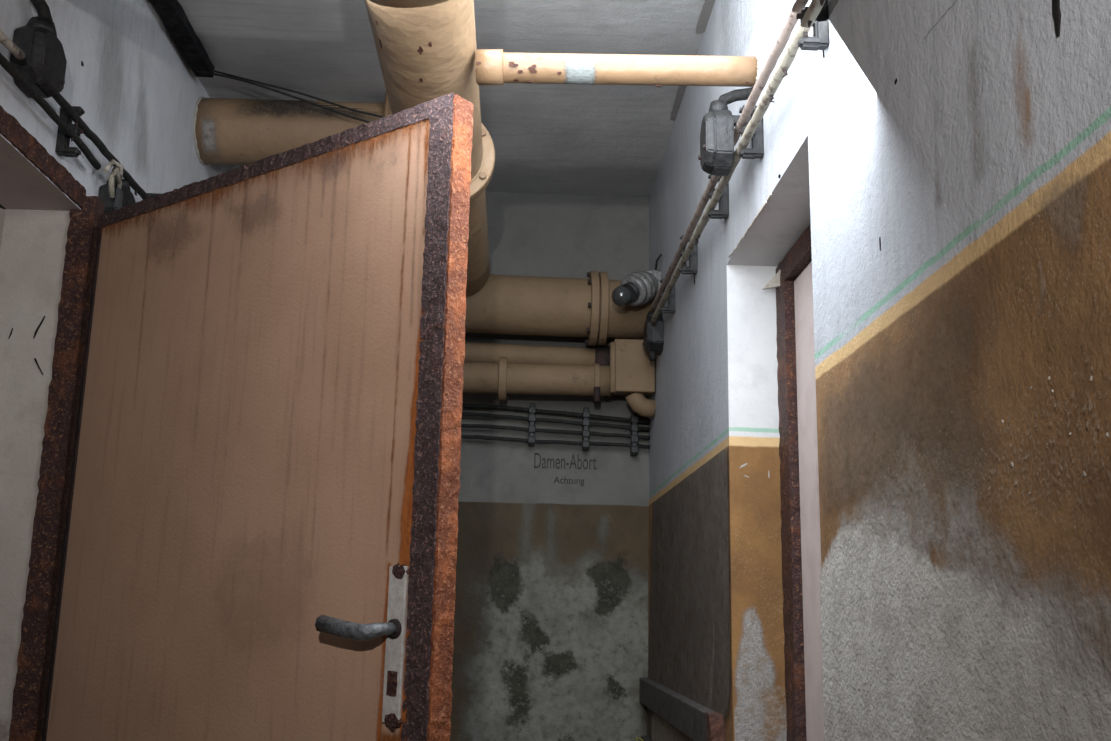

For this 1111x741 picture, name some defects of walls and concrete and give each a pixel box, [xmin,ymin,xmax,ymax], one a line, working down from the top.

crack [1052,0,1061,37]
mould [488,557,577,725]
peeling [464,504,693,741]
mould [588,556,631,615]
water stain [607,676,626,699]
peeling [734,609,787,741]